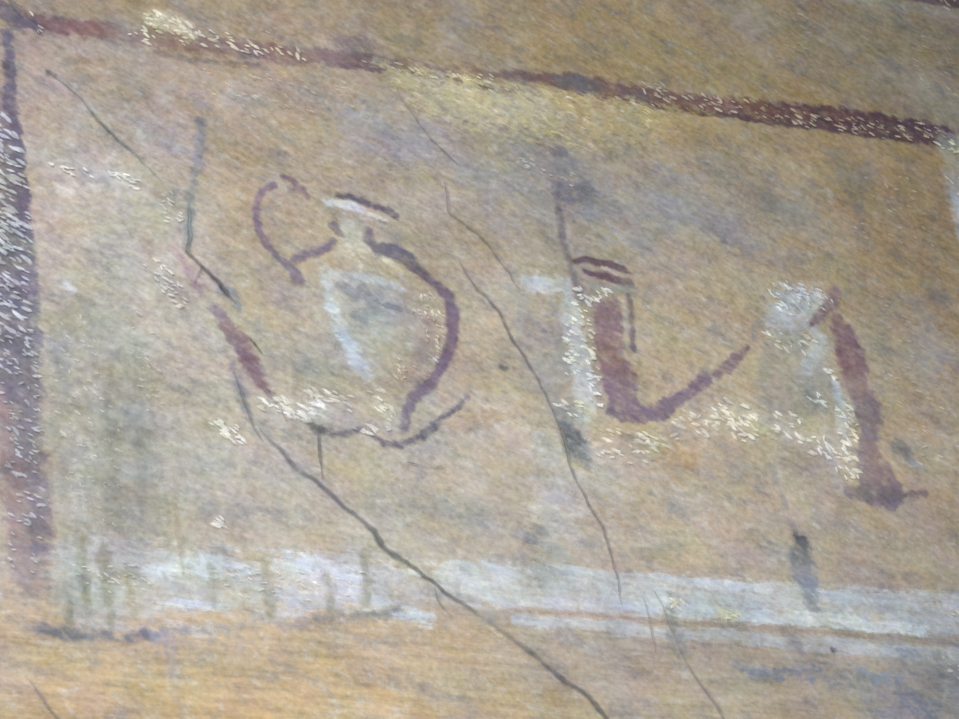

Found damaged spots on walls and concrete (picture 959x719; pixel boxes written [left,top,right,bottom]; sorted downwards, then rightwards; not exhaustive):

flaking render [0,113,33,384]
crack [185,200,236,303]
crack [396,87,519,288]
crack [235,376,609,719]
crack [459,261,620,598]
crack [643,591,722,713]